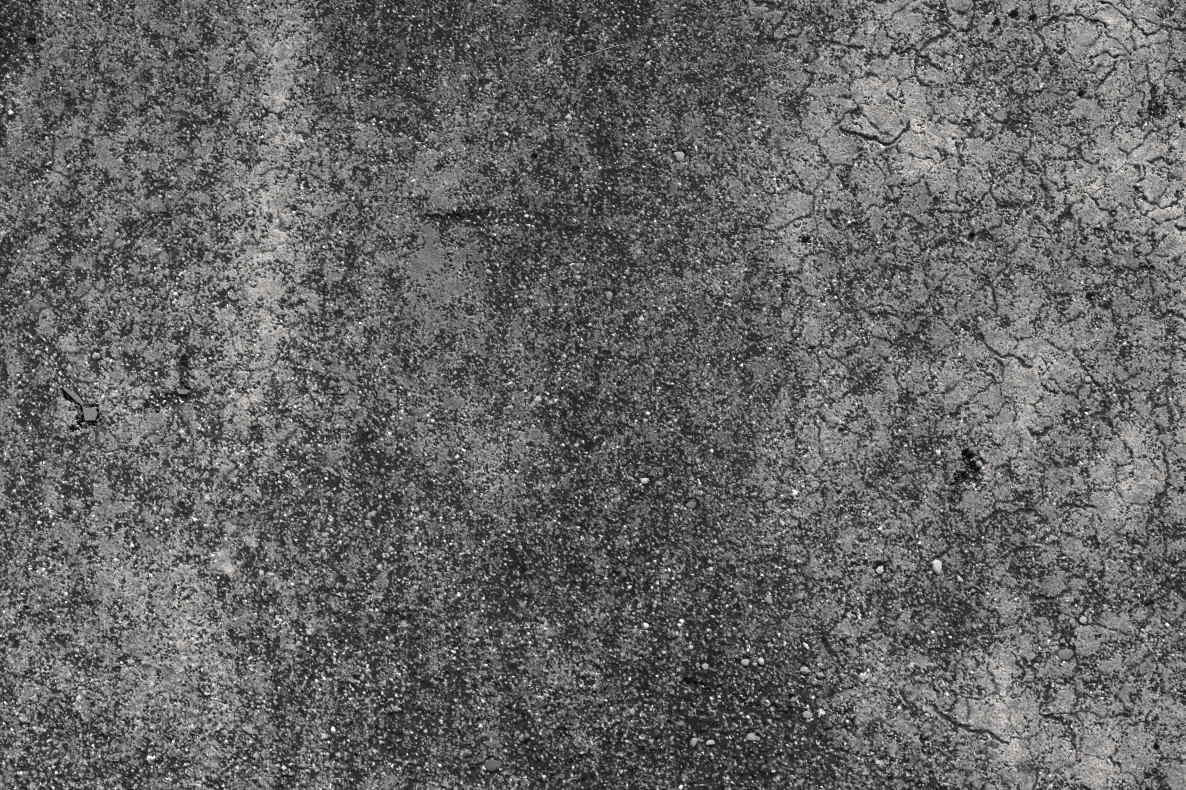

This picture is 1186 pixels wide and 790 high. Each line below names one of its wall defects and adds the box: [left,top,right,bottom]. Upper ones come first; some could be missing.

crack [750,0,1186,283]
crack [793,277,922,362]
crack [1153,303,1186,343]
crack [868,370,880,398]
crack [978,335,1056,394]
crack [1027,424,1054,438]
crack [1112,368,1181,516]
crack [977,504,1101,547]
crack [1037,575,1104,604]
crack [932,704,1010,790]
crack [1040,714,1076,746]